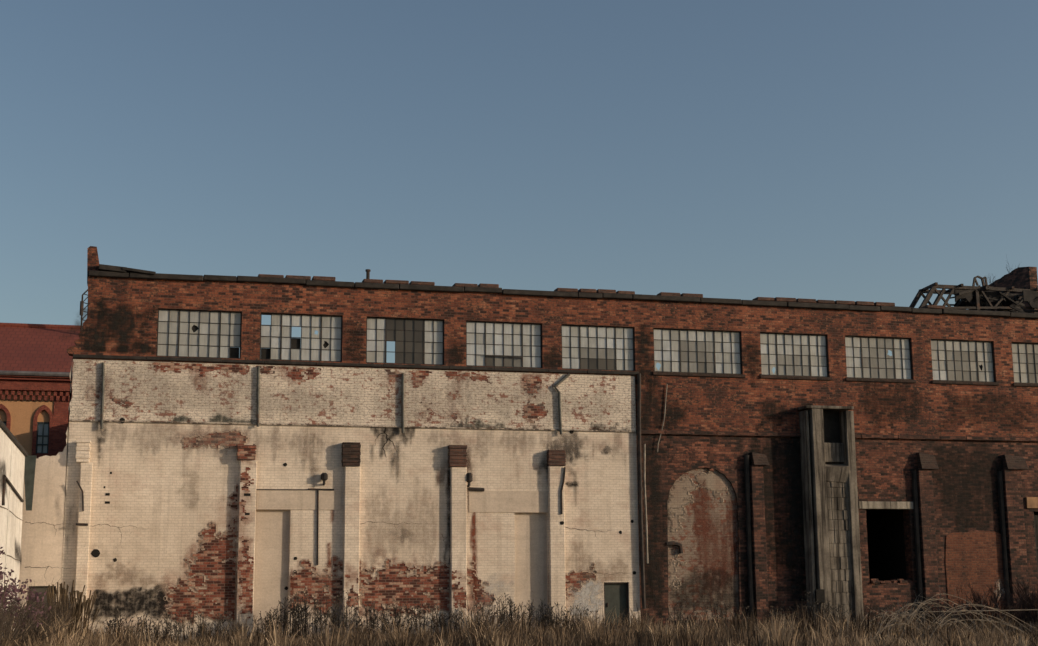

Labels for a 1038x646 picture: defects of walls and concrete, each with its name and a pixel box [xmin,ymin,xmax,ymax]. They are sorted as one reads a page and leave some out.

flaking render [385,369,432,388]
flaking render [445,371,492,400]
flaking render [516,375,548,423]
flaking render [180,429,257,452]
damp [371,427,415,455]
flaking render [667,468,734,533]
flaking render [163,467,254,625]
flaking render [284,555,496,620]
flaking render [565,562,598,601]
flaking render [668,549,687,591]